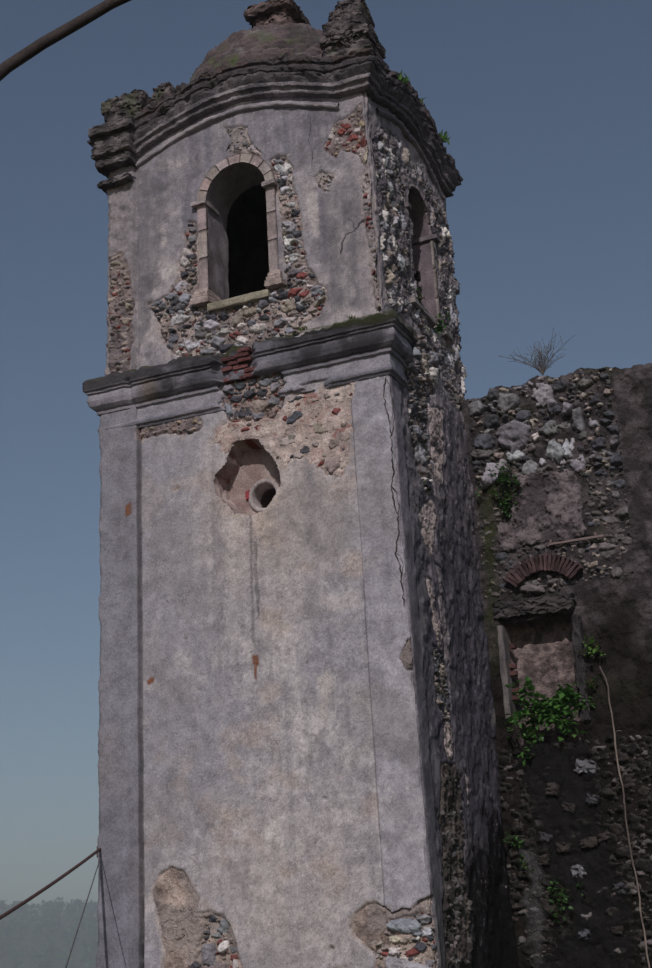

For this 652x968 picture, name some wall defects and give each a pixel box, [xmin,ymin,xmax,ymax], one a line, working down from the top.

peeling [106,253,135,373]
peeling [148,127,355,477]
crack [340,218,365,255]
peeling [135,417,203,440]
crack [383,378,405,609]
spalling [323,105,473,968]
spalling [153,867,242,968]
leakage [467,707,519,968]
leakage [521,739,635,968]